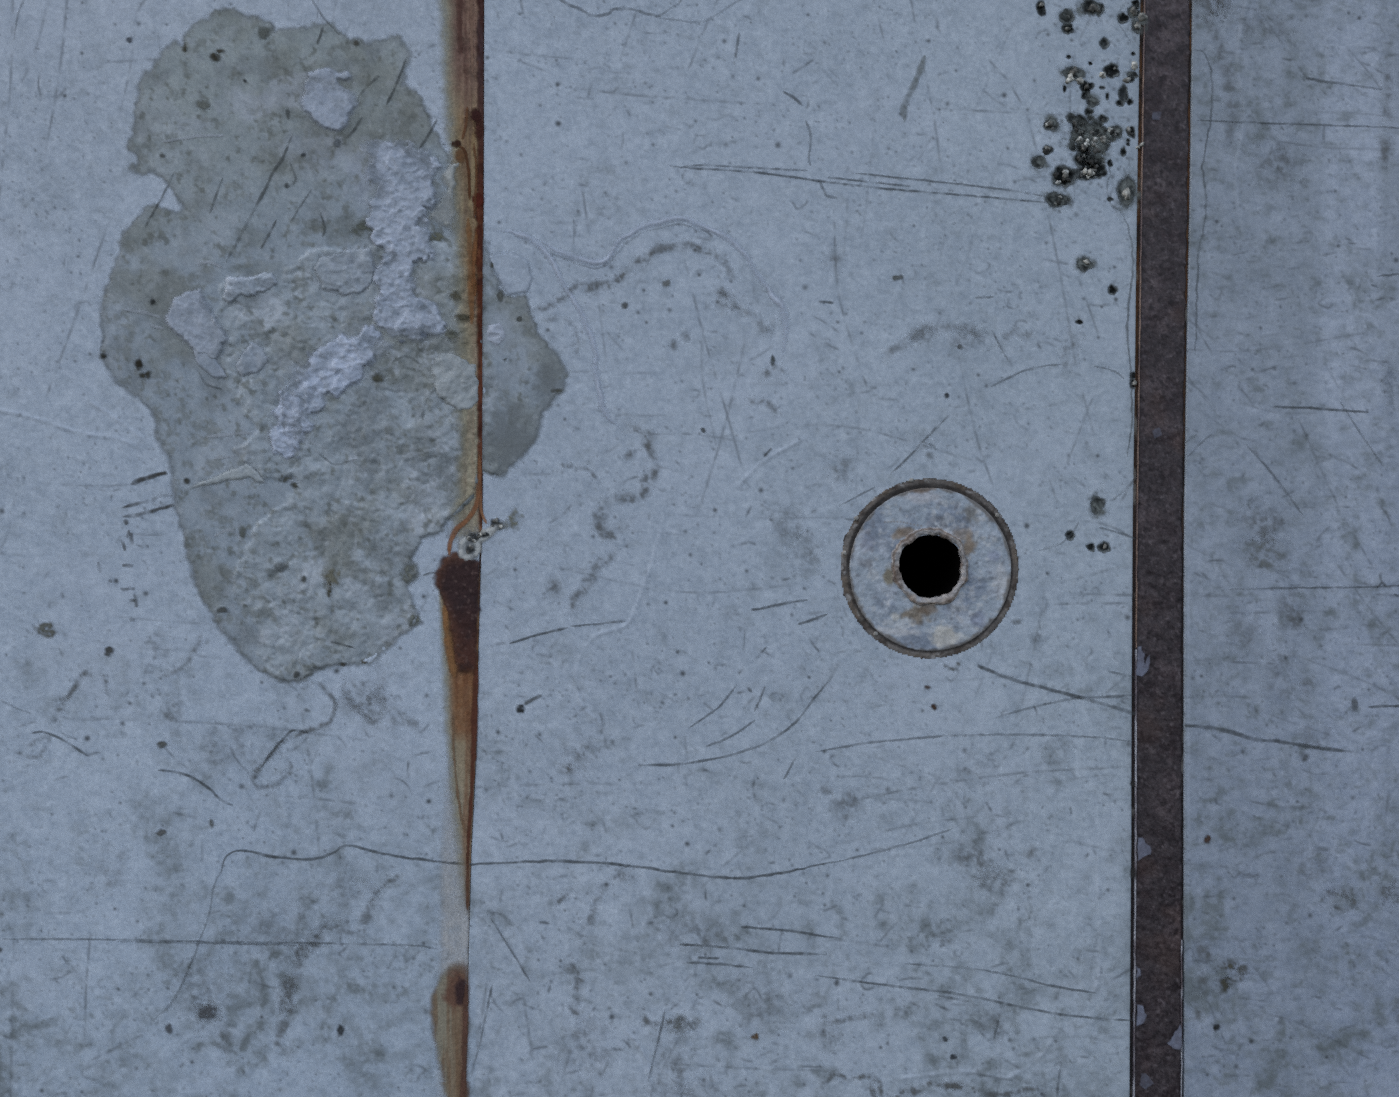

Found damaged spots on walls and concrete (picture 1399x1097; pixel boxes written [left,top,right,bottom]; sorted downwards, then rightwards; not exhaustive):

peeling [100,8,568,683]
corrosion [435,0,487,910]
corrosion [431,965,468,1097]